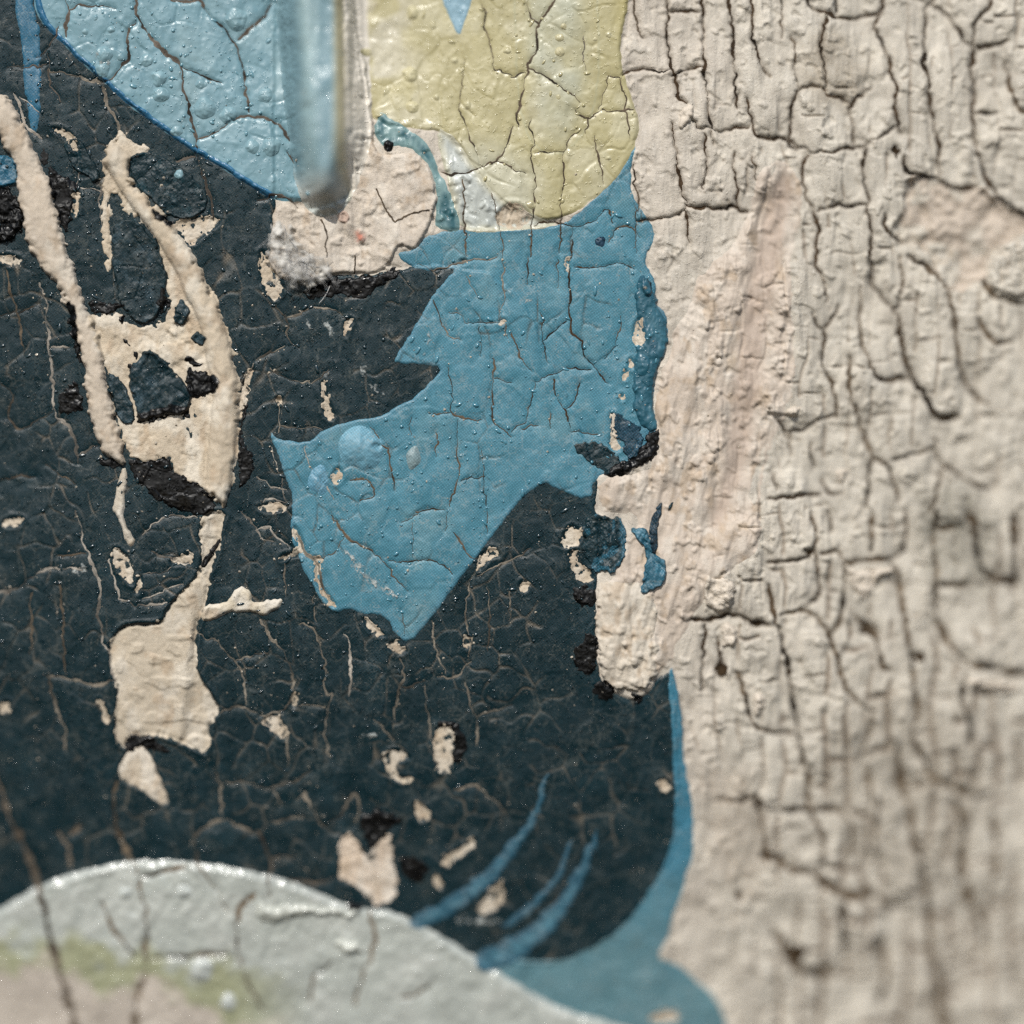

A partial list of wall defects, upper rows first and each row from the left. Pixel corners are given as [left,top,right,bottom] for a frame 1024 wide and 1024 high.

crack [7,0,294,223]
peeling [258,114,438,302]
crack [902,0,1024,218]
crack [0,510,198,751]
peeling [0,94,282,804]
peeling [433,724,455,774]
crack [197,0,989,758]
peeling [574,412,647,475]
peeling [560,502,673,594]
crack [688,357,1024,1024]
crack [101,736,360,1024]
peeling [337,832,398,907]